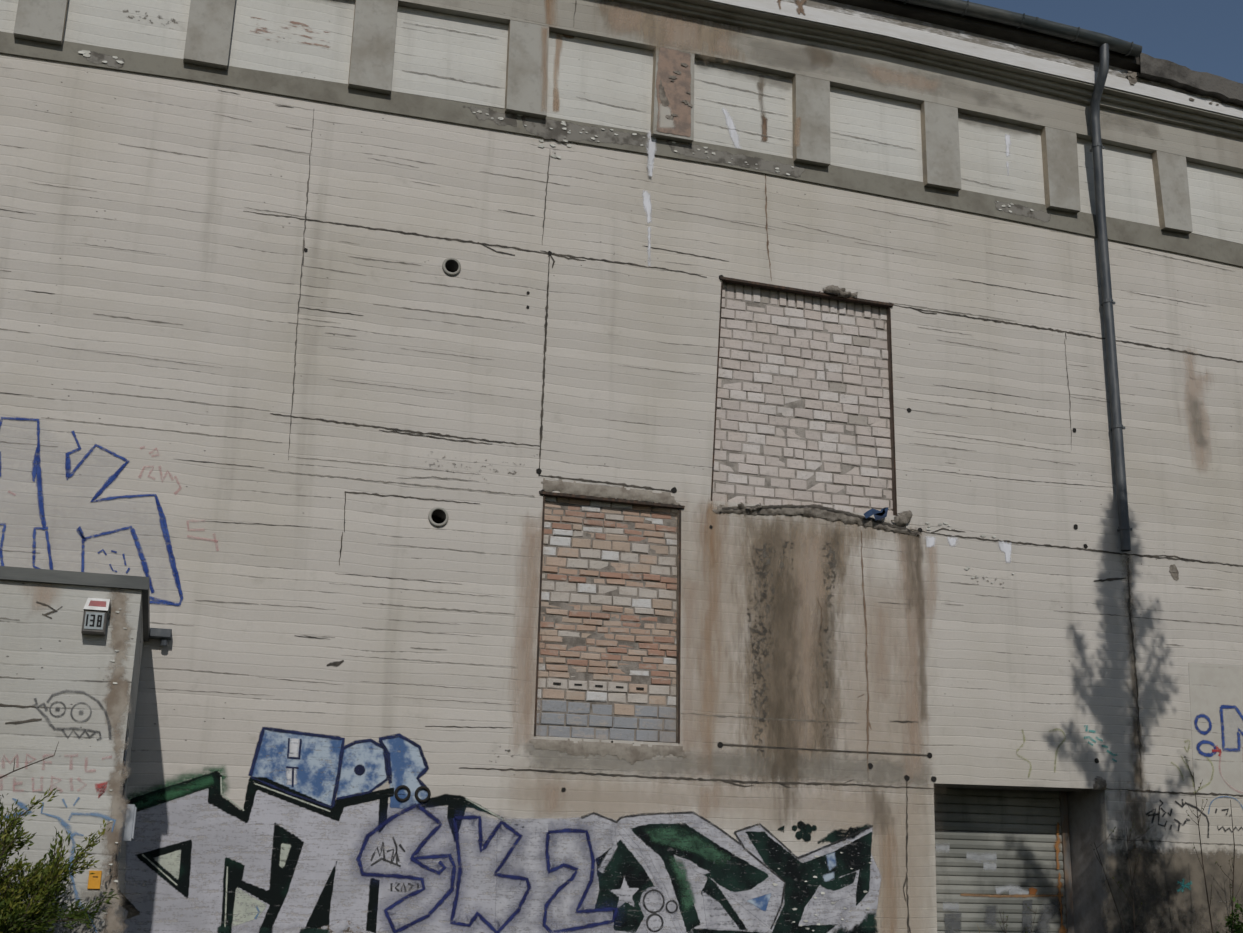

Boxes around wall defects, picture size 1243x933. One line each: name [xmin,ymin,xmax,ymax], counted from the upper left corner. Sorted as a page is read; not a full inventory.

peeling [78,50,124,69]
corrosion [544,29,574,111]
spalling [463,47,693,159]
water stain [647,131,656,176]
water stain [643,191,651,266]
crack [0,90,725,728]
crack [889,302,1243,488]
water stain [742,519,873,778]
crack [461,504,1243,933]